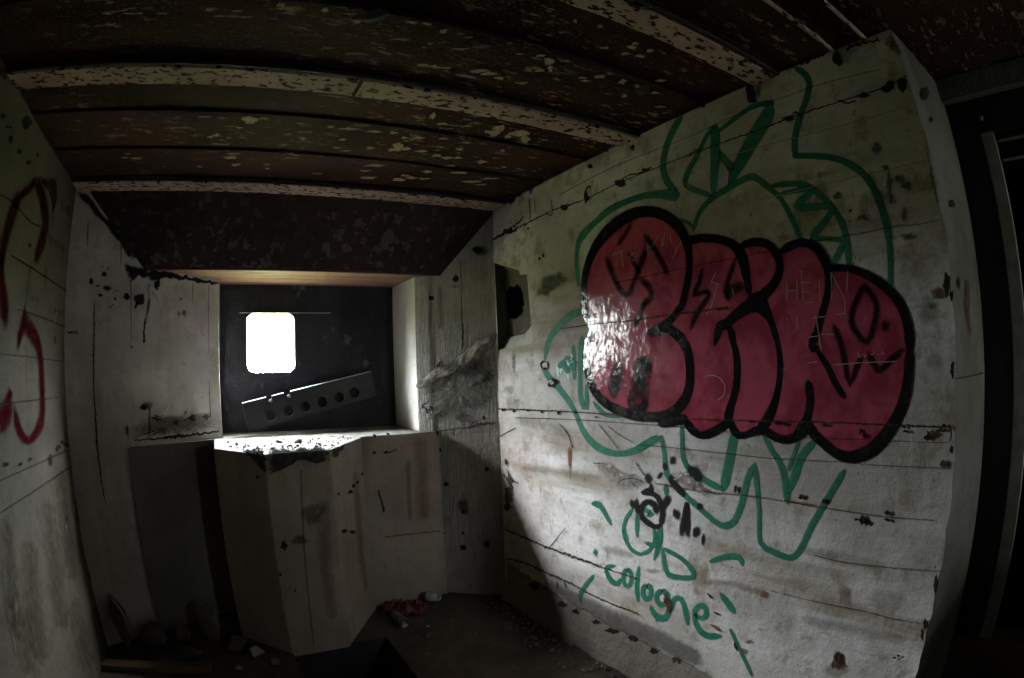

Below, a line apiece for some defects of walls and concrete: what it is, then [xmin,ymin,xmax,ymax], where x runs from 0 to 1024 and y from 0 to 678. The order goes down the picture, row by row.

peeling [470,69,527,85]
peeling [535,55,570,72]
peeling [579,72,666,108]
peeling [621,42,654,58]
peeling [236,116,268,129]
peeling [484,125,530,152]
peeling [327,126,507,185]
crack [492,75,907,241]
peeling [125,264,219,291]
damp [125,402,219,441]
spalling [241,444,345,479]